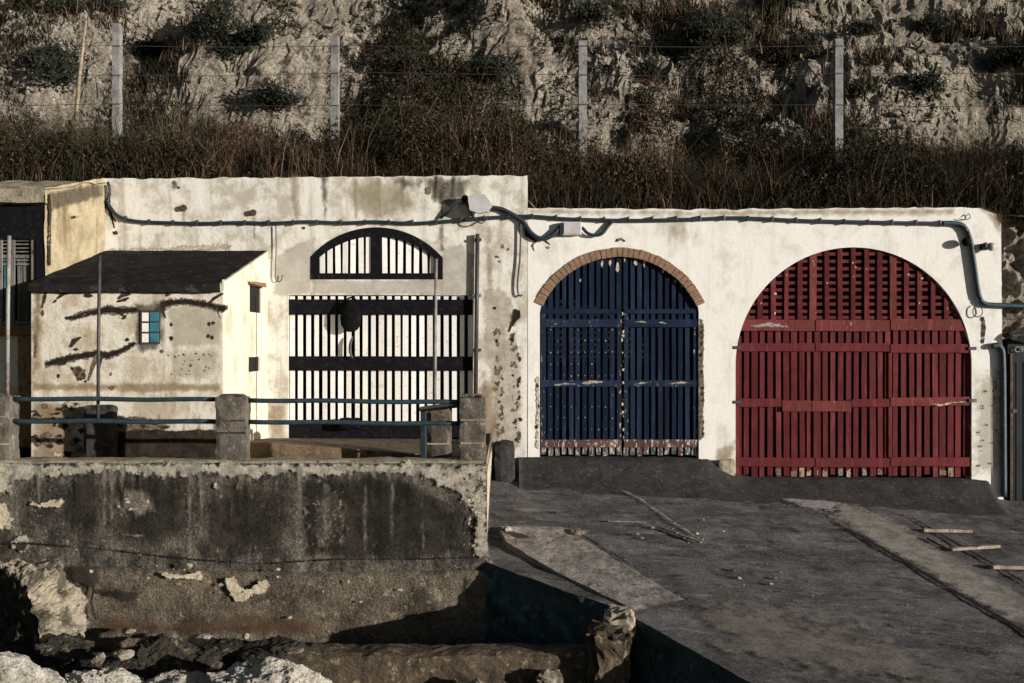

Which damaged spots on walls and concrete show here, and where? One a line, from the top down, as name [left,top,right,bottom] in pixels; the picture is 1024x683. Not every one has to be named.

peeling [57,366,87,382]
flaking render [160,306,220,376]
peeling [484,287,522,537]
spalling [29,498,65,508]
damp [3,424,491,563]
spalling [156,563,281,604]